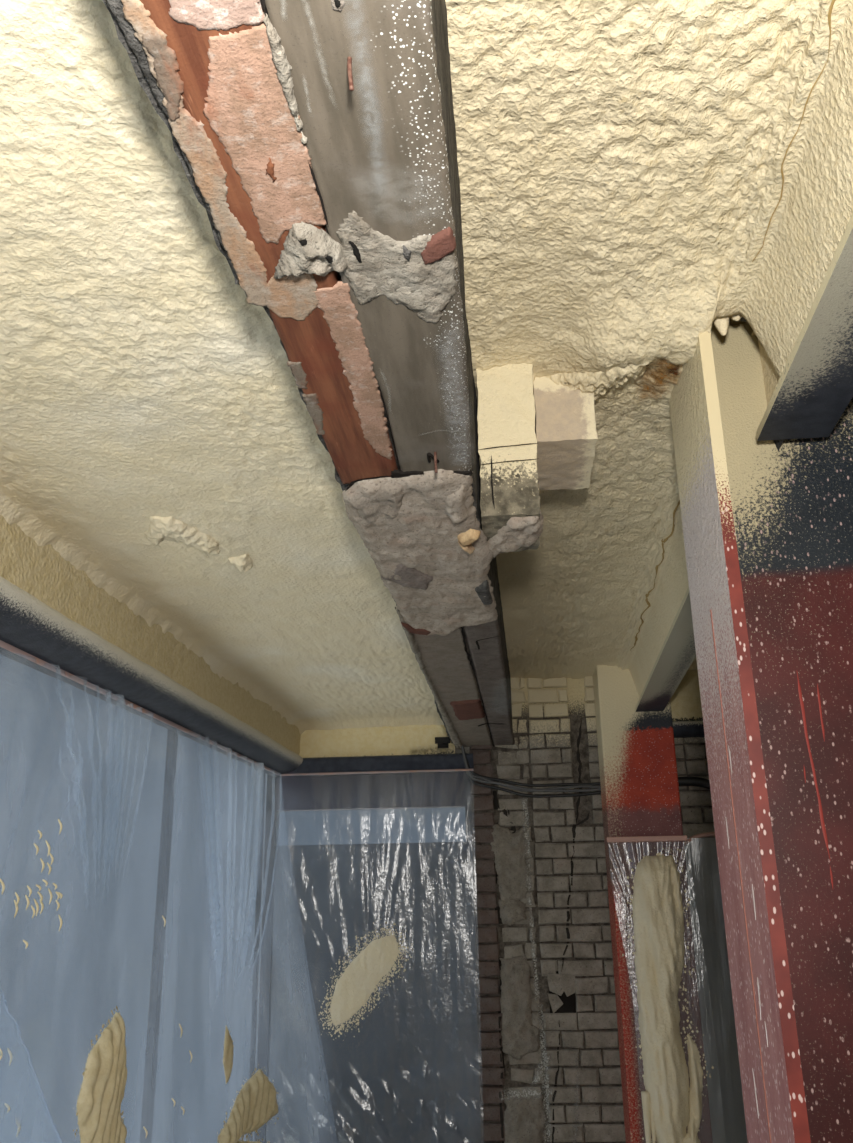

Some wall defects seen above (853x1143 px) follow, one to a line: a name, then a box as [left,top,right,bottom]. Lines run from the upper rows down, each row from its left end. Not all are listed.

crack [752,0,835,262]
peeling [121,0,459,460]
corrosion [644,360,678,397]
spalling [342,469,498,636]
crack [630,500,680,650]
spalling [490,824,530,926]
spalling [499,954,540,1060]
spalling [547,971,576,1014]
spalling [504,1095,547,1143]